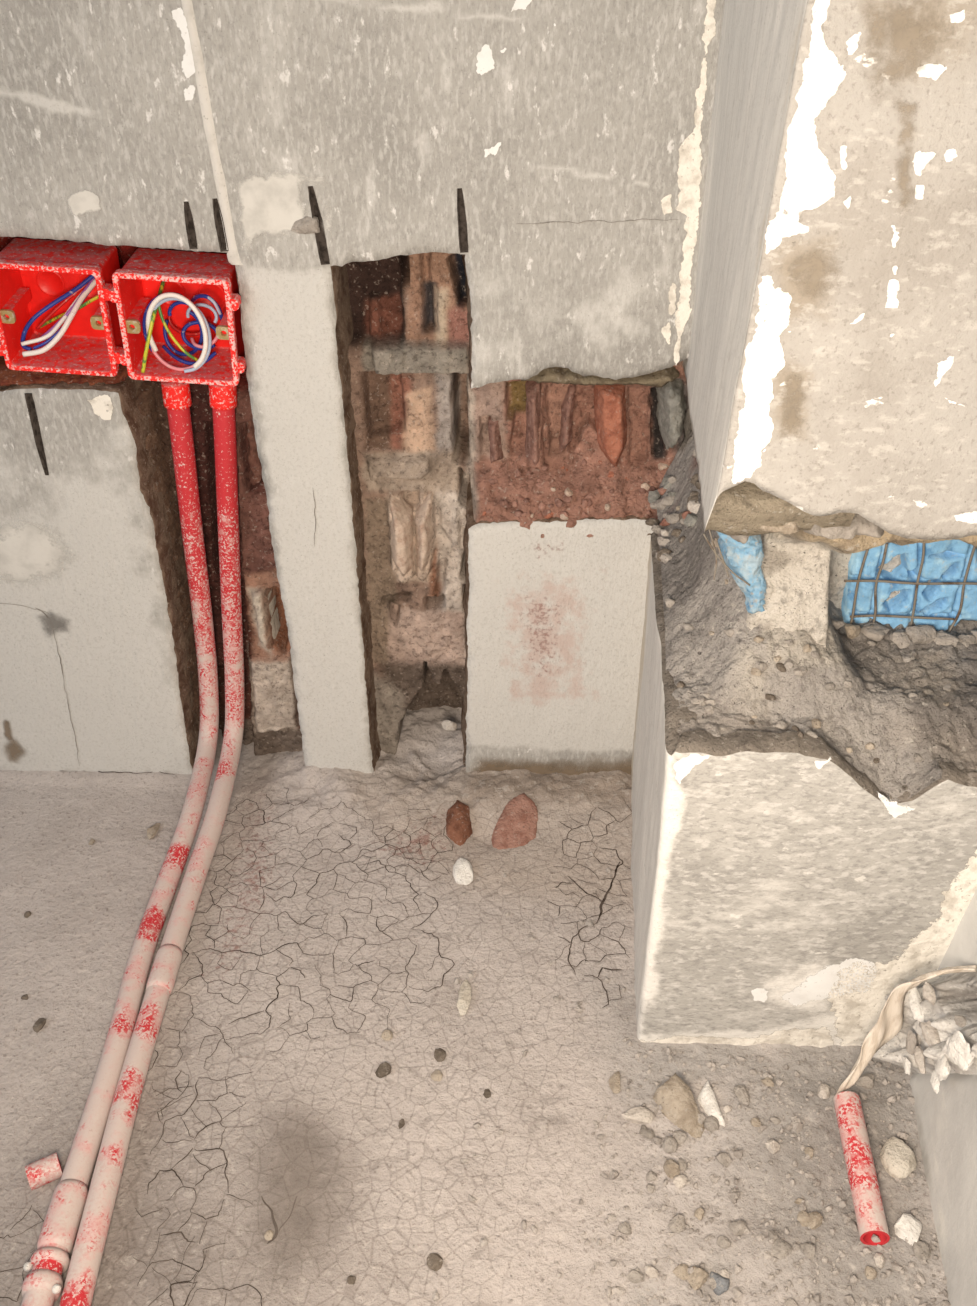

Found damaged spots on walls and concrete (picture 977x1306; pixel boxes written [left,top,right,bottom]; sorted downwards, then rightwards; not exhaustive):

flaking render [171,7,195,101]
flaking render [0,237,92,252]
flaking render [115,245,227,269]
flaking render [154,381,177,494]
spalling [346,0,977,818]
flaking render [189,383,225,737]
flaking render [235,357,303,756]
crack [0,603,168,774]
crack [567,862,620,972]
spalling [640,849,977,1094]
crack [261,1196,297,1244]